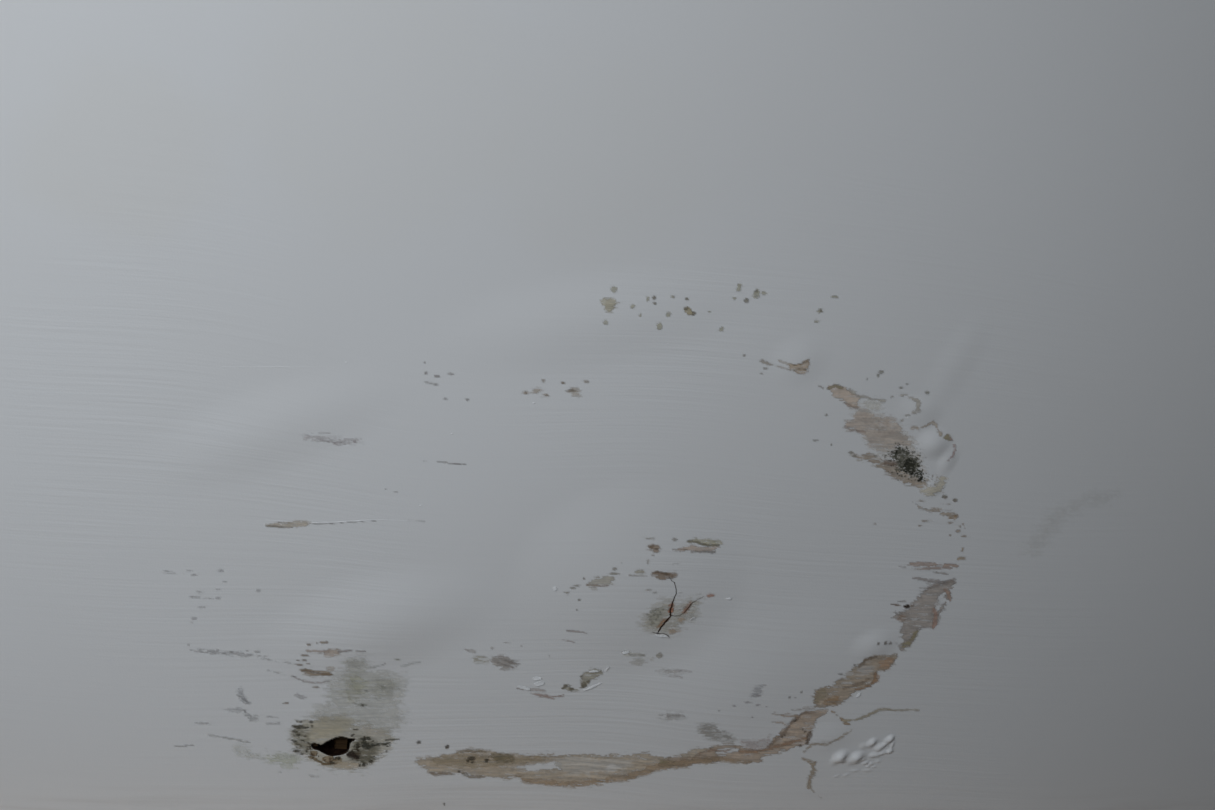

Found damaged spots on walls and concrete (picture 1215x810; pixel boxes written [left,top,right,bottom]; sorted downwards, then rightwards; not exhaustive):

crack [653,576,695,638]
damp [416,385,965,789]
peeling [465,649,516,668]
peeling [517,667,609,699]
damp [275,678,399,768]